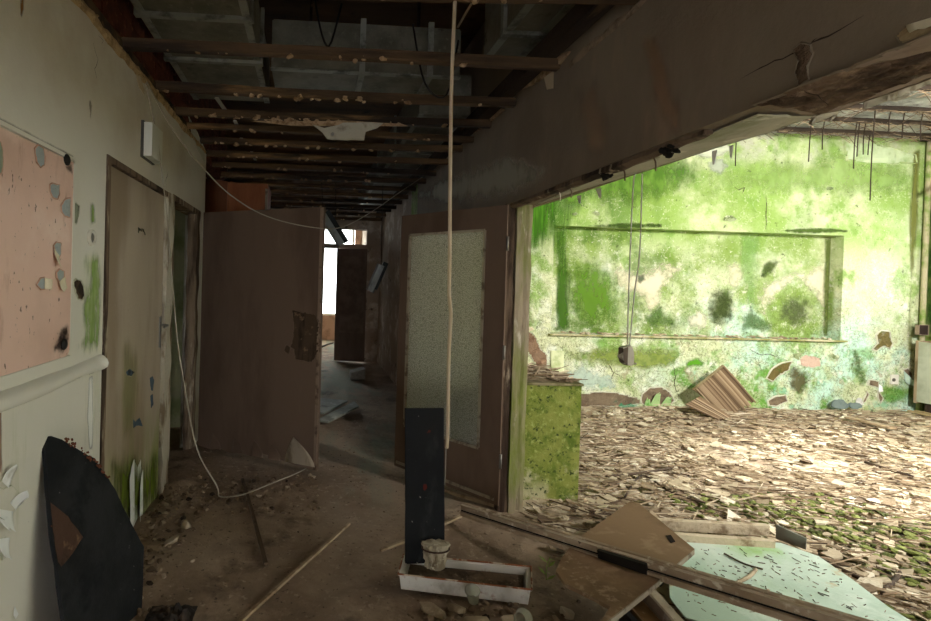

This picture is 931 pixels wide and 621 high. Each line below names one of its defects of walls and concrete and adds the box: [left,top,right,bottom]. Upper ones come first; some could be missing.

spalling [71,0,206,162]
spalling [534,18,931,217]
efflorescence [697,145,729,174]
water stain [910,150,920,269]
spalling [36,241,86,301]
water stain [557,230,676,330]
water stain [689,264,743,328]
water stain [744,262,825,329]
spalling [767,394,788,407]
spalling [765,352,840,382]
spalling [856,379,884,405]
spalling [871,329,894,352]